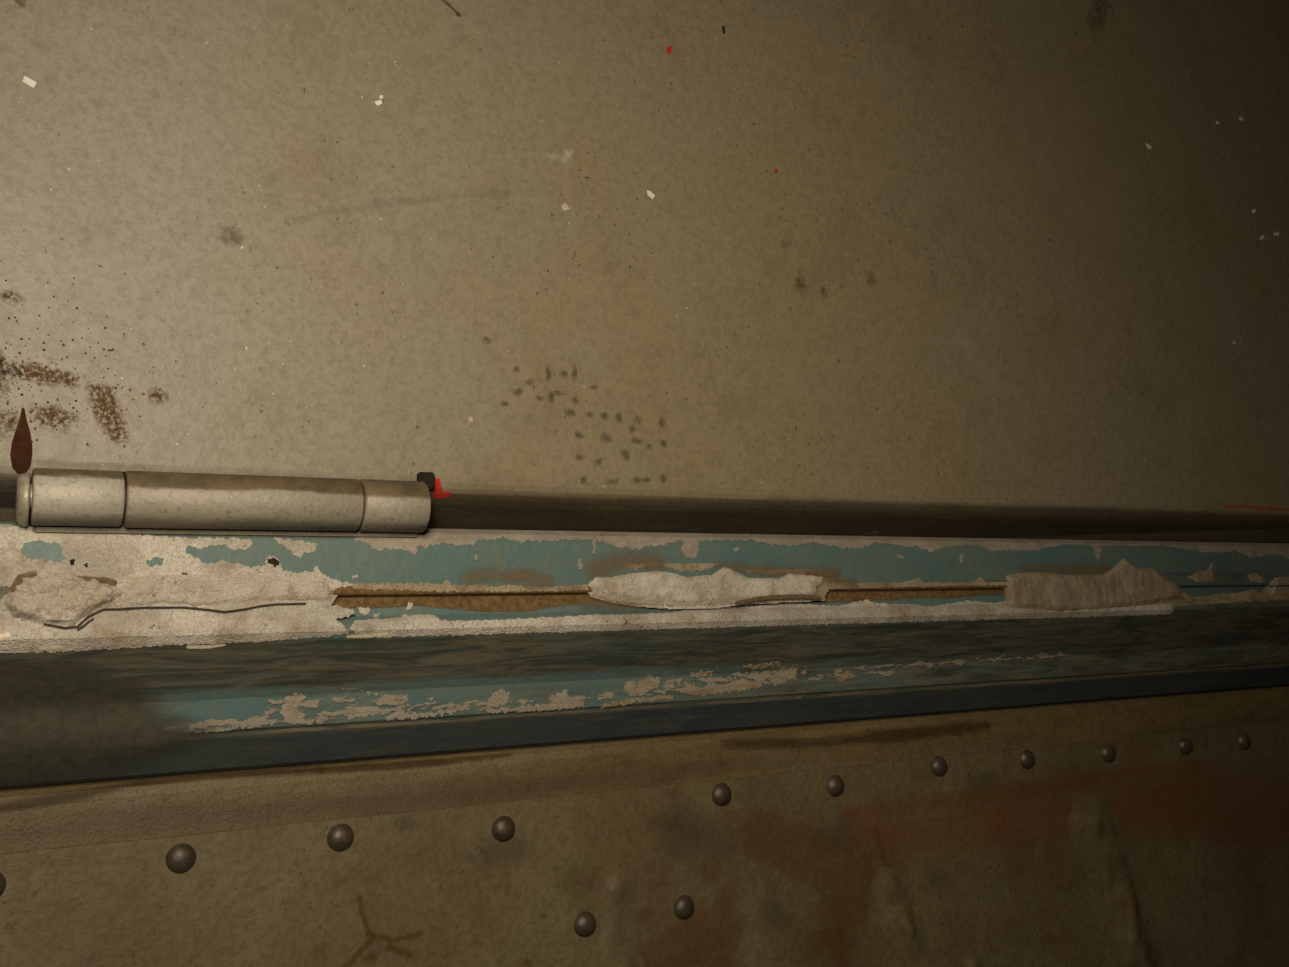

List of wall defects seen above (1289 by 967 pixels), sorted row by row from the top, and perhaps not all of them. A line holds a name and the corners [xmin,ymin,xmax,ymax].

rust [0,280,162,448]
crack [10,571,37,592]
crack [44,576,306,630]
peeling [0,524,1289,654]
peeling [170,651,1072,734]